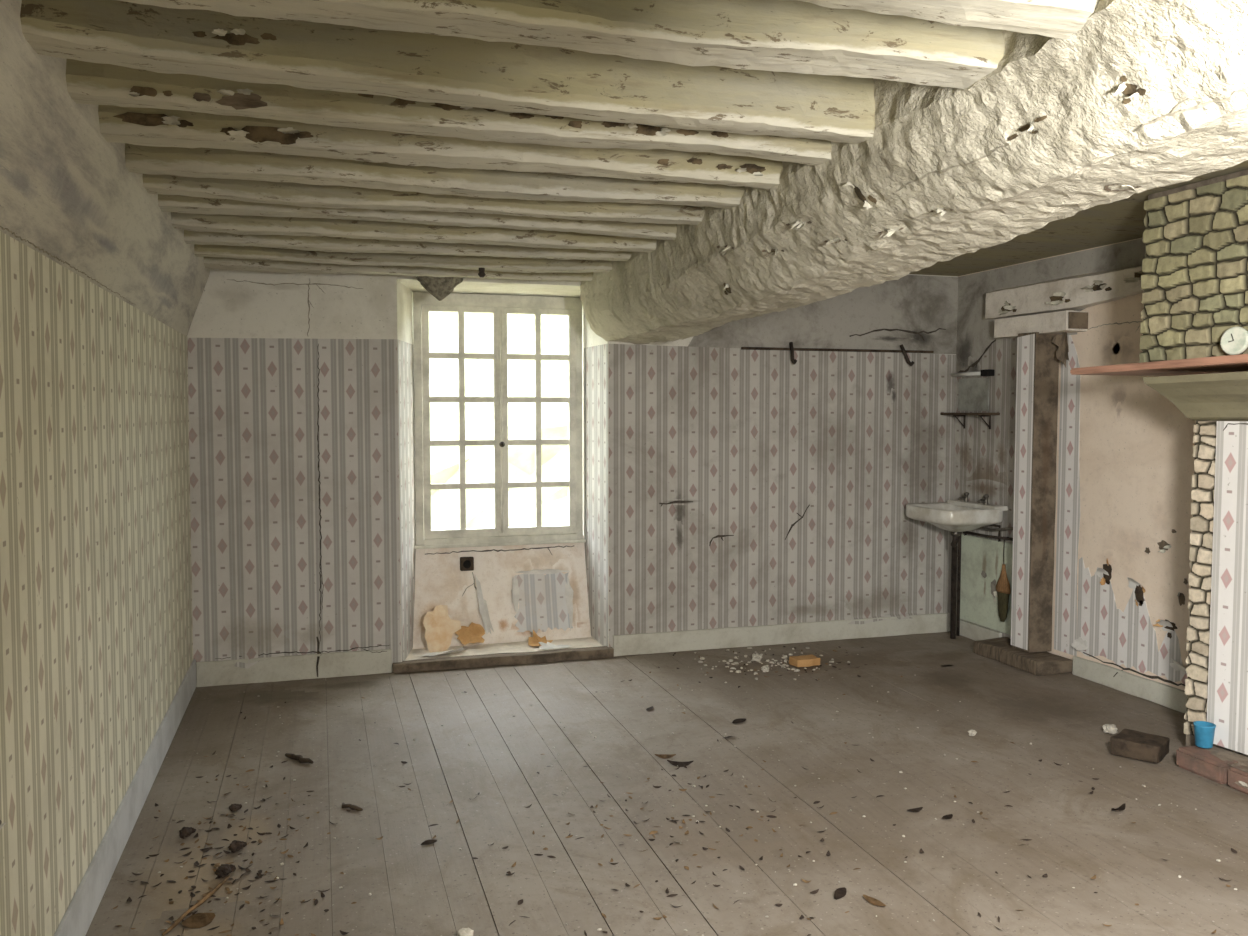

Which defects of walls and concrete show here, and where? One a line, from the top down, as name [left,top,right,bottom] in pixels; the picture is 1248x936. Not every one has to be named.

peeling [192,29,277,46]
peeling [129,86,173,97]
peeling [193,88,267,110]
peeling [113,112,194,128]
peeling [220,126,313,148]
spalling [1100,559,1112,585]
spalling [1135,585,1146,606]
spalling [1153,619,1177,639]